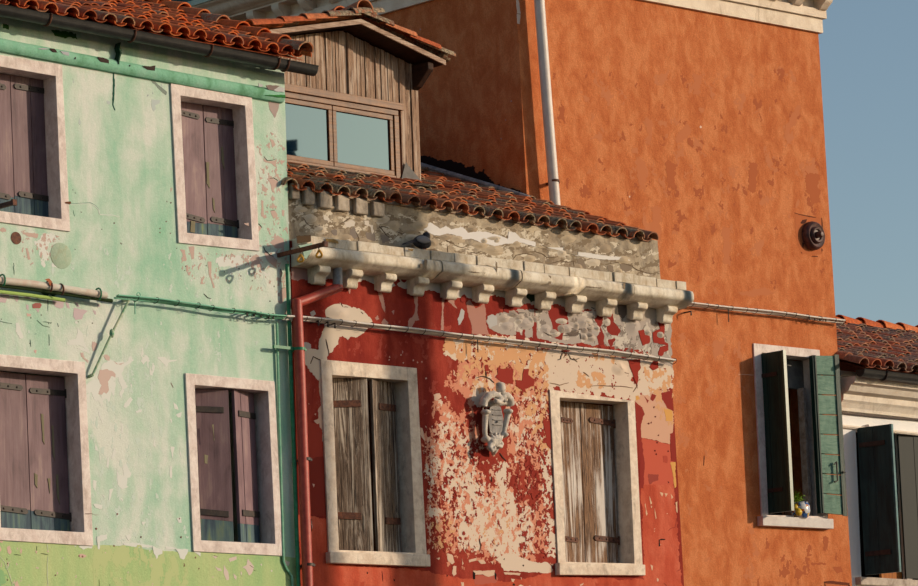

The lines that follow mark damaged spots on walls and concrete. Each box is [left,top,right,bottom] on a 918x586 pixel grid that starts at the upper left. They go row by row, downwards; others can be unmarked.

peeling [21,230,60,267]
peeling [176,132,425,324]
flaking render [433,221,572,266]
flaking render [582,242,659,276]
peeling [78,341,177,413]
flaking render [304,303,372,441]
peeling [420,300,674,586]
peeling [212,556,272,580]